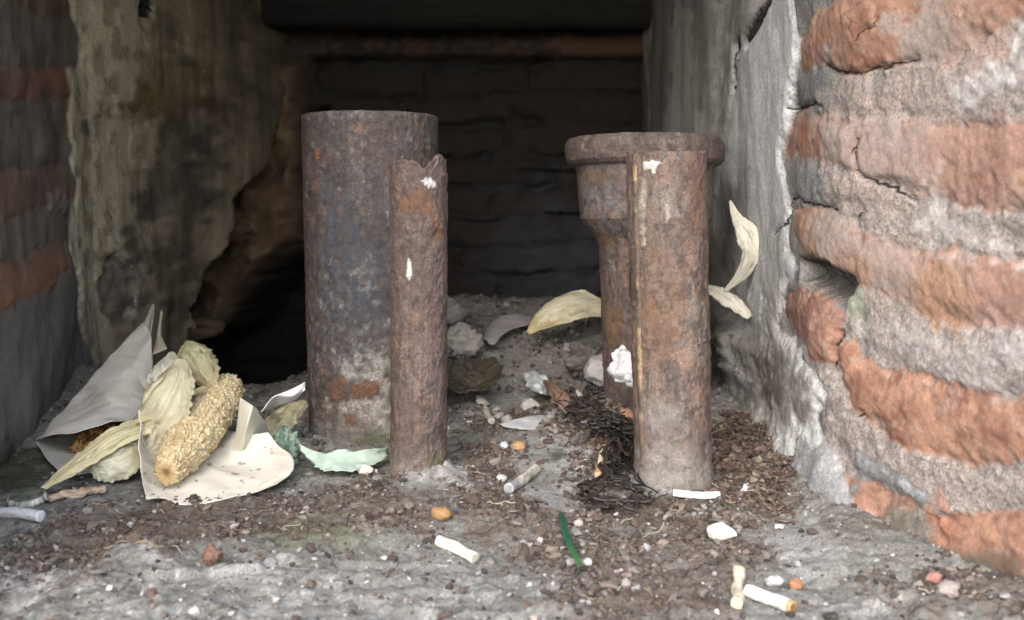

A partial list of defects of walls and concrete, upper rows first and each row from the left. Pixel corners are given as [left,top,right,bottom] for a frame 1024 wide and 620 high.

crack [851,137,918,202]
rust [329,376,379,402]